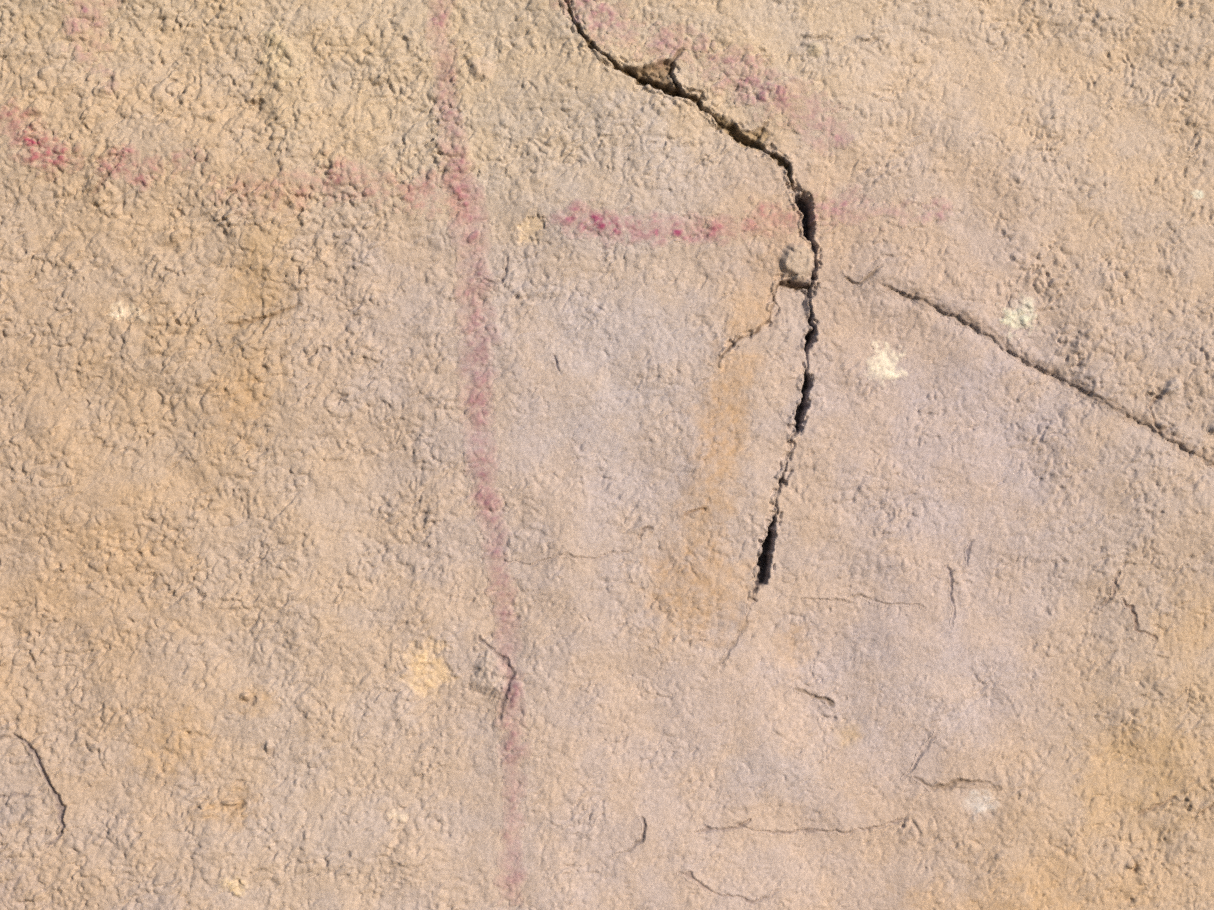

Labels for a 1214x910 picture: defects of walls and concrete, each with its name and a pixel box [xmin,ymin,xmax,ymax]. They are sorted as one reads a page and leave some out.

crack [477,256,510,286]
crack [563,0,1214,678]
crack [551,353,560,373]
crack [502,525,654,566]